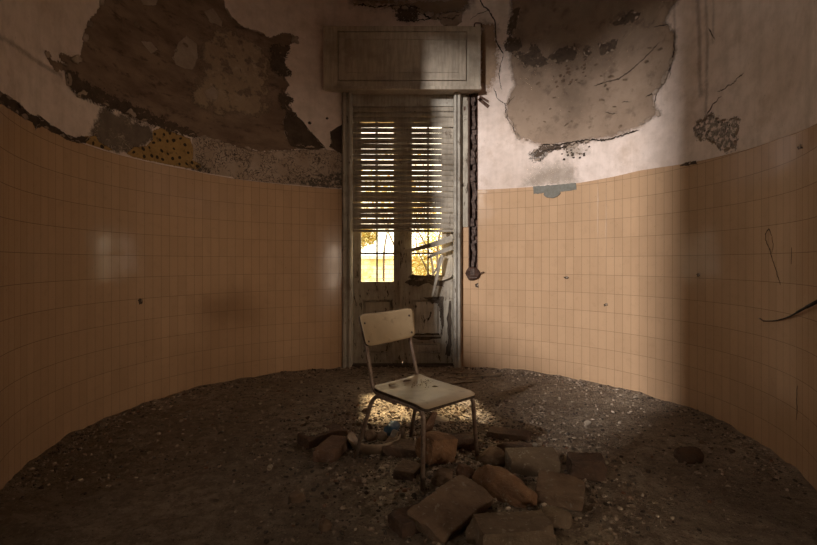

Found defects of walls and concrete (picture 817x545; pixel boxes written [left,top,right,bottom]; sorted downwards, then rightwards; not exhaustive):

peeling [45,0,342,154]
peeling [350,0,470,26]
crack [358,0,516,135]
spalling [529,140,590,163]
peeling [504,8,618,68]
crack [594,24,675,102]
spalling [693,75,742,154]